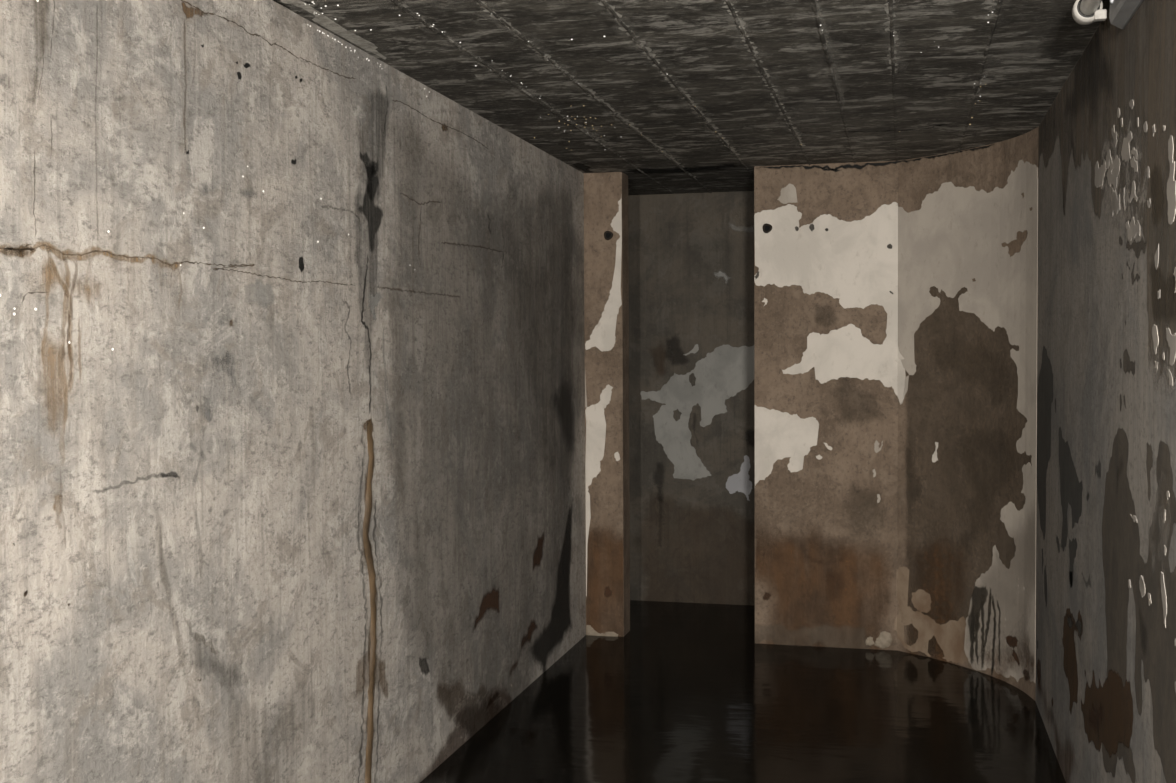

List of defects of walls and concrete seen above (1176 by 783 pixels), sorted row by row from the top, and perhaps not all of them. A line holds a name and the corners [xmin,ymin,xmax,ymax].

corrosion [44,259,91,296]
crack [0,242,460,297]
water stain [358,97,386,410]
peeling [585,195,622,352]
corrosion [46,315,70,423]
peeling [585,376,620,596]
peeling [640,344,754,481]
peeling [726,405,832,501]
peeling [754,160,1038,683]
corrosion [358,418,387,783]
water stain [968,587,1000,673]
corrosion [1062,608,1133,757]